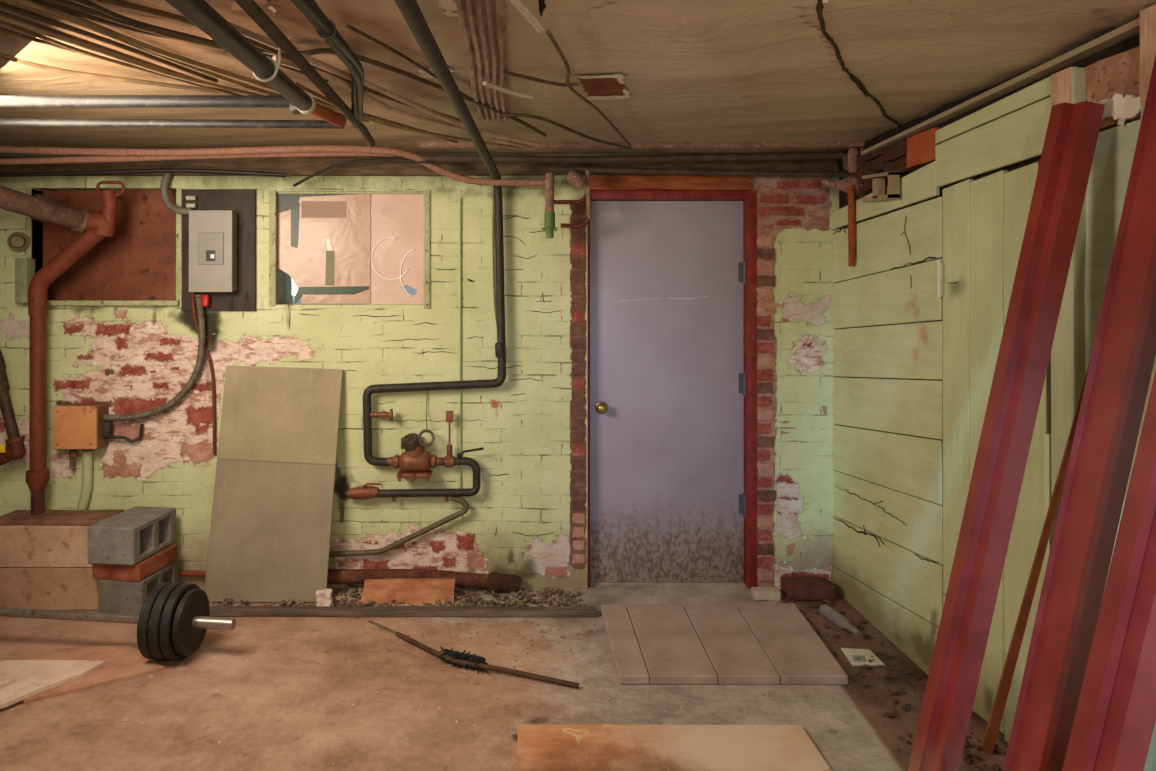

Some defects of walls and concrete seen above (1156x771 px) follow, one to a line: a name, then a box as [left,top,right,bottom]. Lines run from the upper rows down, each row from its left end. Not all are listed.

crack [816,0,900,128]
peeling [0,313,30,341]
peeling [53,310,314,483]
spalling [755,177,833,589]
peeling [0,411,29,471]
peeling [48,451,77,485]
crack [833,486,907,547]
peeling [333,523,489,574]